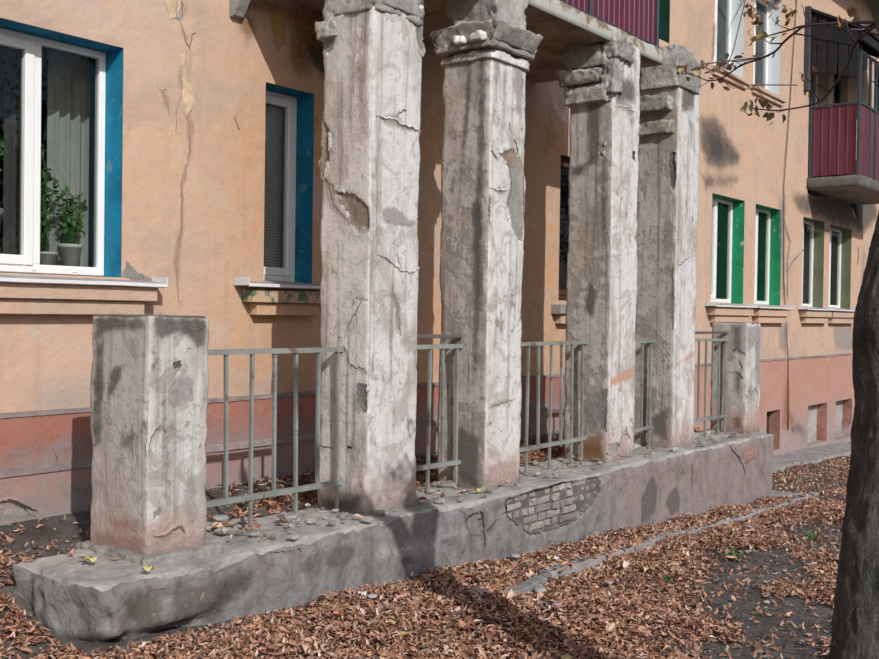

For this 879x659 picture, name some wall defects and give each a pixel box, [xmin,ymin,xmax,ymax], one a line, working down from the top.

leakage [252,3,324,73]
crack [157,0,196,302]
spalling [318,119,333,180]
crack [376,109,421,133]
leakage [682,89,694,110]
spalling [332,184,370,233]
spalling [495,148,526,241]
leakage [156,315,204,346]
crack [338,297,368,374]
leakage [94,346,120,441]
crack [459,509,506,553]
flaking render [505,476,601,534]